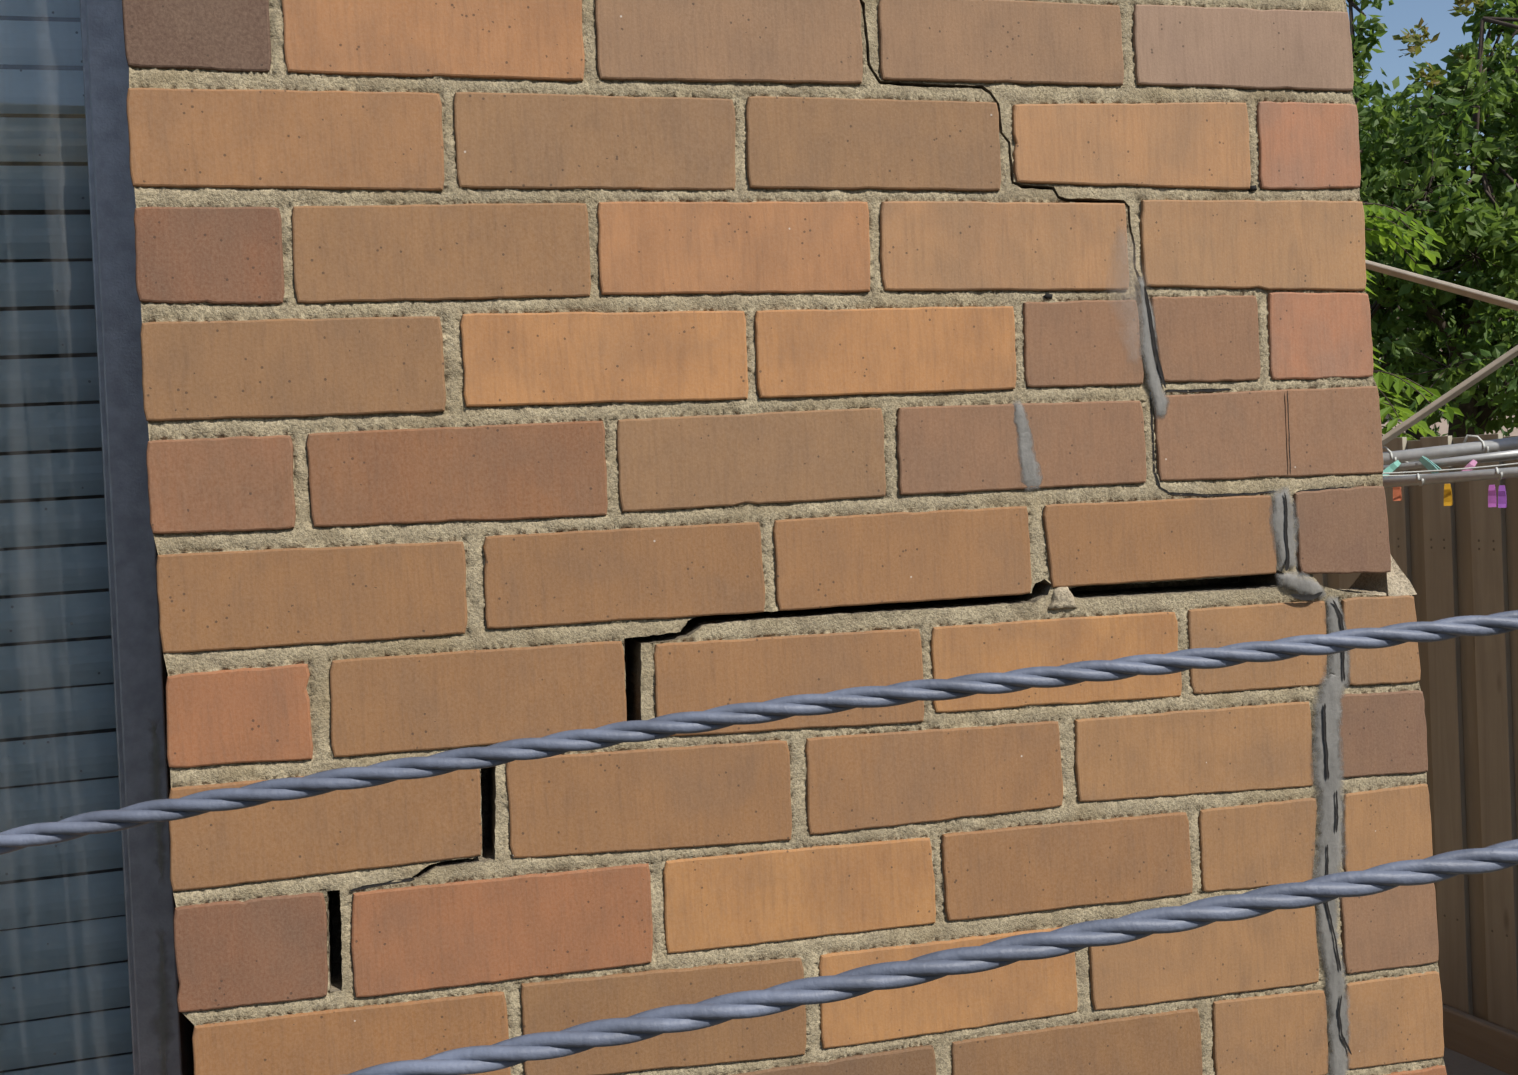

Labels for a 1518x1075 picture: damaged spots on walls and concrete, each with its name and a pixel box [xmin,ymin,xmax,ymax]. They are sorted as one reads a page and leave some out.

crack [327,766,496,992]
crack [624,0,1352,1055]